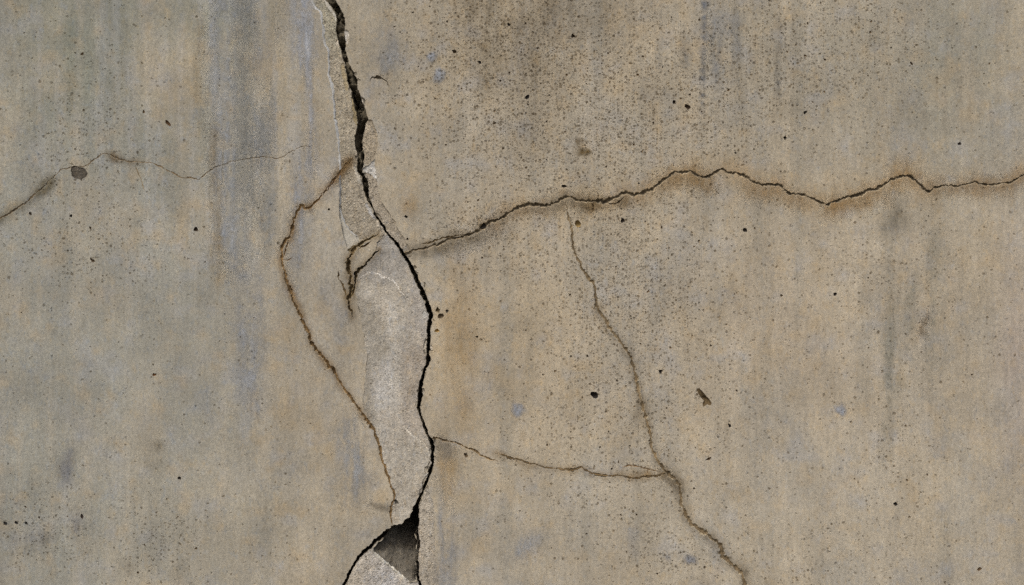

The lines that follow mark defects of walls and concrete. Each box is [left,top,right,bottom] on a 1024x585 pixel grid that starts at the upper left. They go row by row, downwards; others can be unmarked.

crack [0,145,313,219]
spalling [311,0,440,585]
crack [280,0,1024,585]